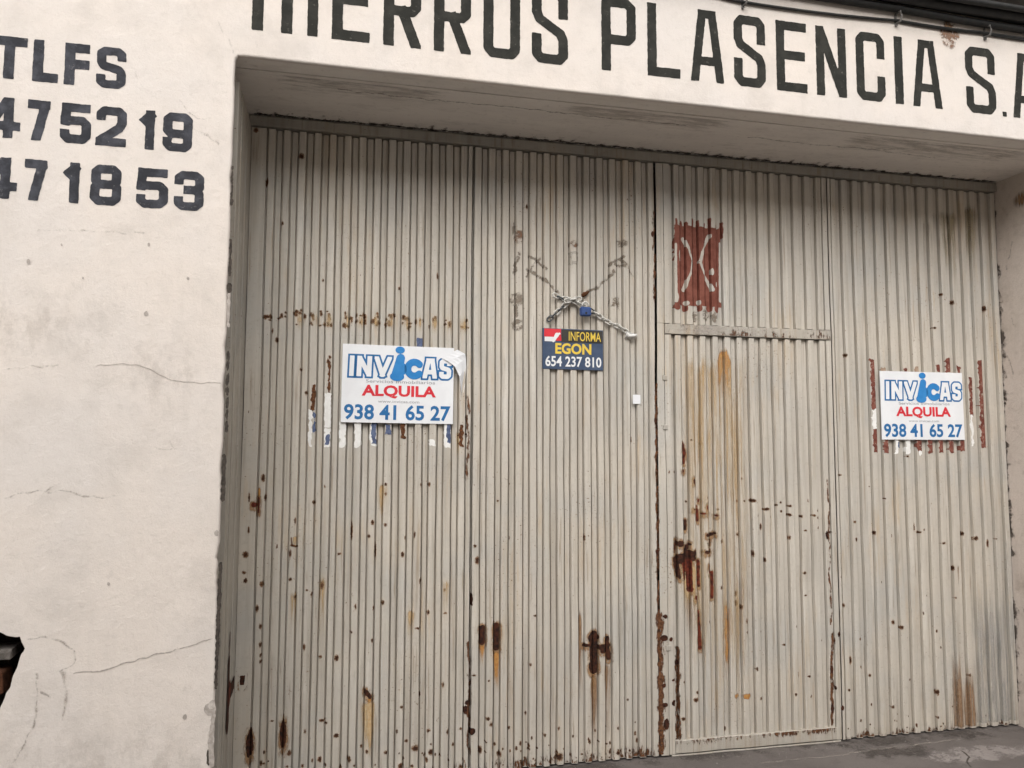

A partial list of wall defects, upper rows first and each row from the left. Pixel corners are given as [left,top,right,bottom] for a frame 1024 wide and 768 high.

corrosion [262,309,469,342]
crack [97,363,216,384]
corrosion [384,351,850,768]
spalling [0,632,25,707]
crack [22,638,213,749]
corrosion [244,727,269,766]
corrosion [271,713,292,768]